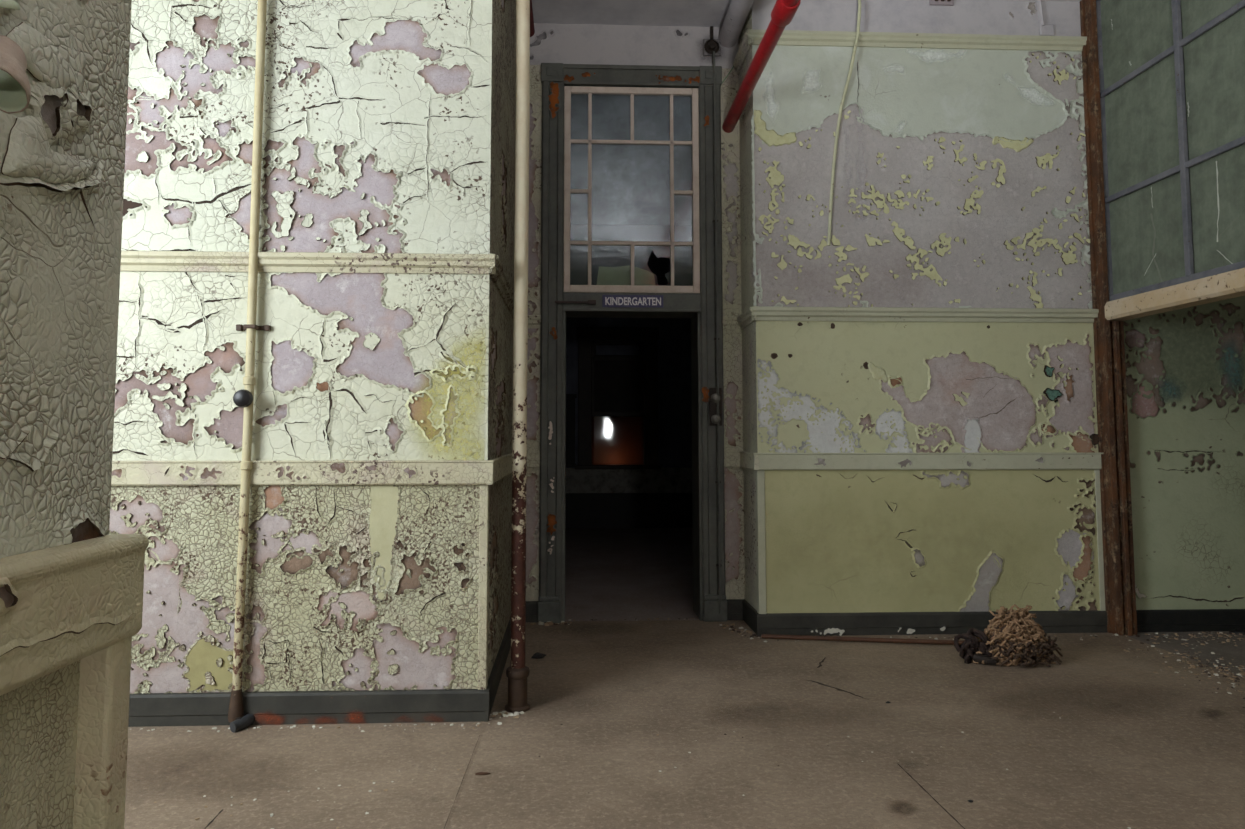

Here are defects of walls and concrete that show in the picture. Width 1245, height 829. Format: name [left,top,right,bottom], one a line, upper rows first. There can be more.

crack [131,0,215,67]
crack [138,95,209,137]
peeling [124,0,408,253]
crack [245,0,490,206]
peeling [346,17,474,98]
peeling [721,50,1092,309]
peeling [114,272,506,458]
peeling [879,332,1098,470]
crack [0,608,136,663]
peeling [55,491,271,694]
peeling [247,463,473,691]
crack [1146,593,1245,605]